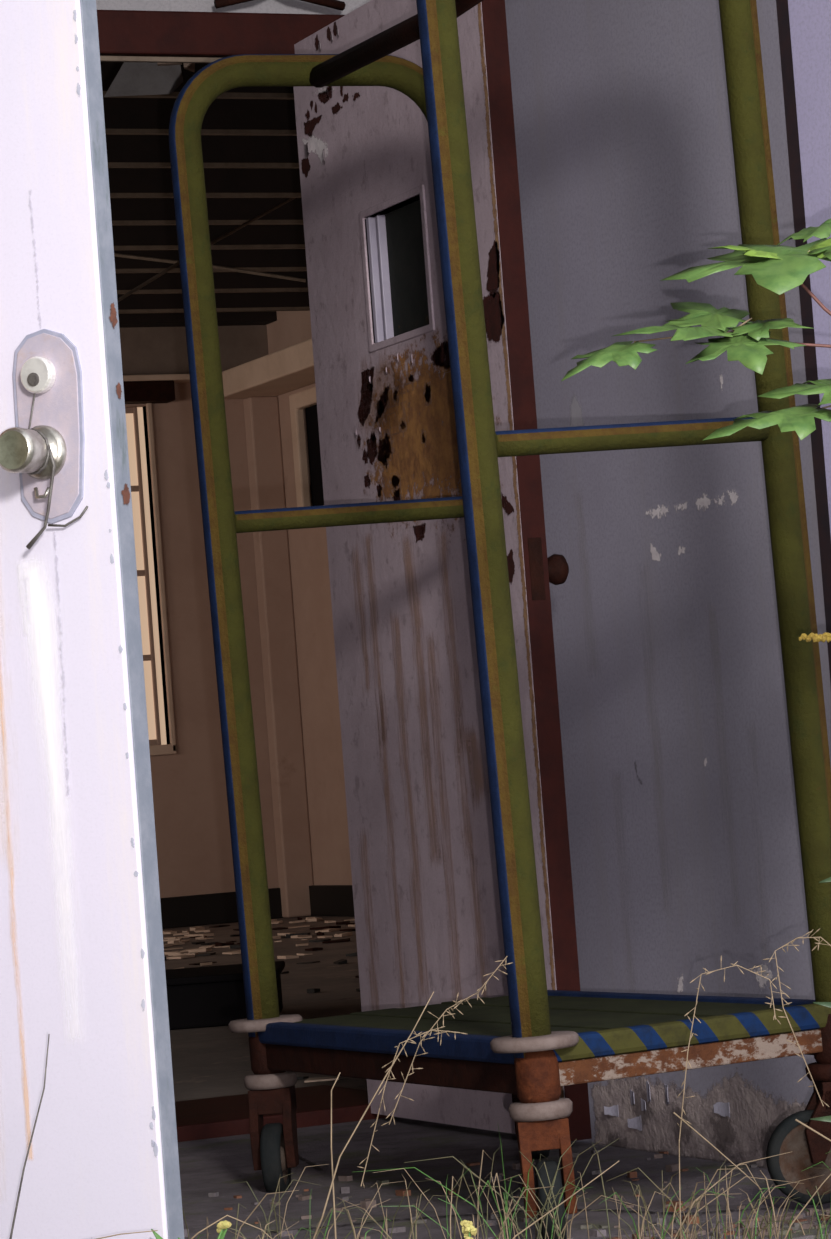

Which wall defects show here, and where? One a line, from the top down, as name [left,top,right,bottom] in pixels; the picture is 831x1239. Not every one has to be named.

peeling [301,86,360,177]
peeling [430,341,450,369]
peeling [355,353,431,501]
peeling [413,523,426,542]
corrosion [23,1051,31,1156]